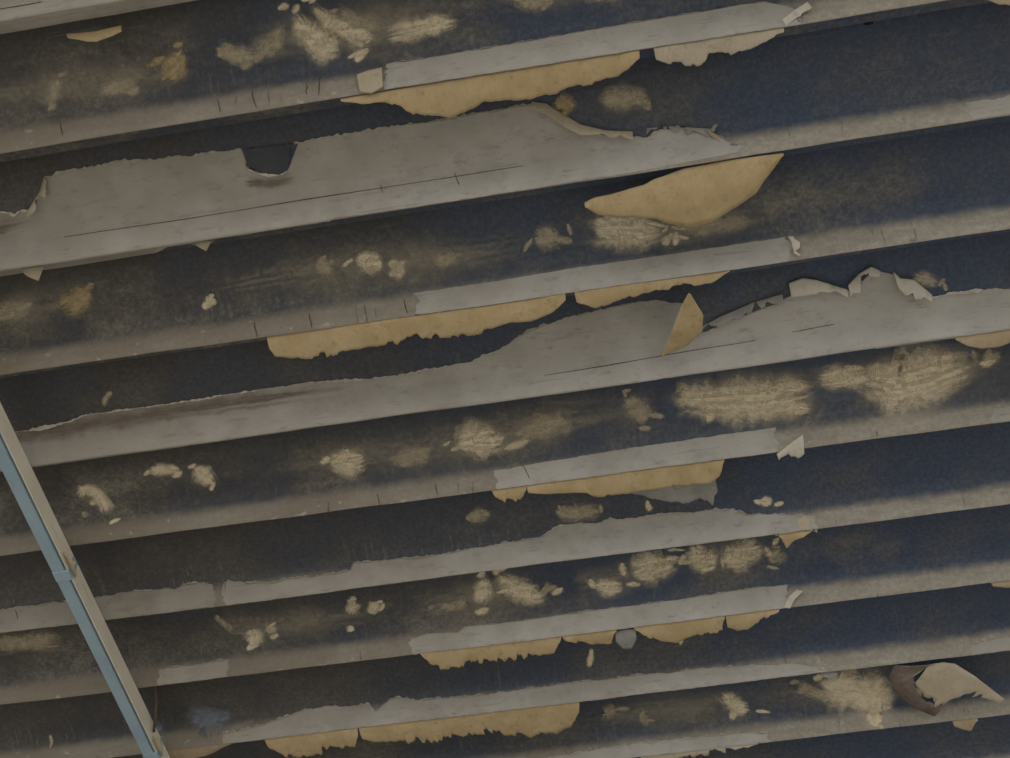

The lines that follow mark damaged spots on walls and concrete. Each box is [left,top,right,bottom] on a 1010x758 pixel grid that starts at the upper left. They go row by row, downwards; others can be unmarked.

peeling [0,0,812,281]
peeling [966,95,1010,120]
peeling [15,236,1010,467]
peeling [94,427,819,620]
peeling [0,600,78,632]
peeling [409,584,803,670]
peeling [222,663,837,758]
peeling [890,662,1004,716]